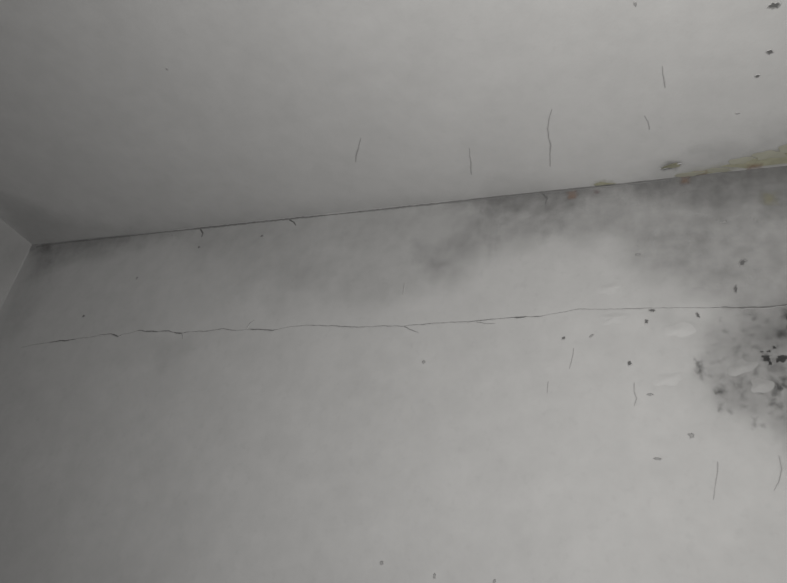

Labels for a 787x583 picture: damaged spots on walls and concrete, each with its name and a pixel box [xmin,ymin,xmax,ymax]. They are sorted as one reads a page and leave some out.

crack [545,109,553,167]
peeling [659,145,787,177]
crack [21,303,787,348]